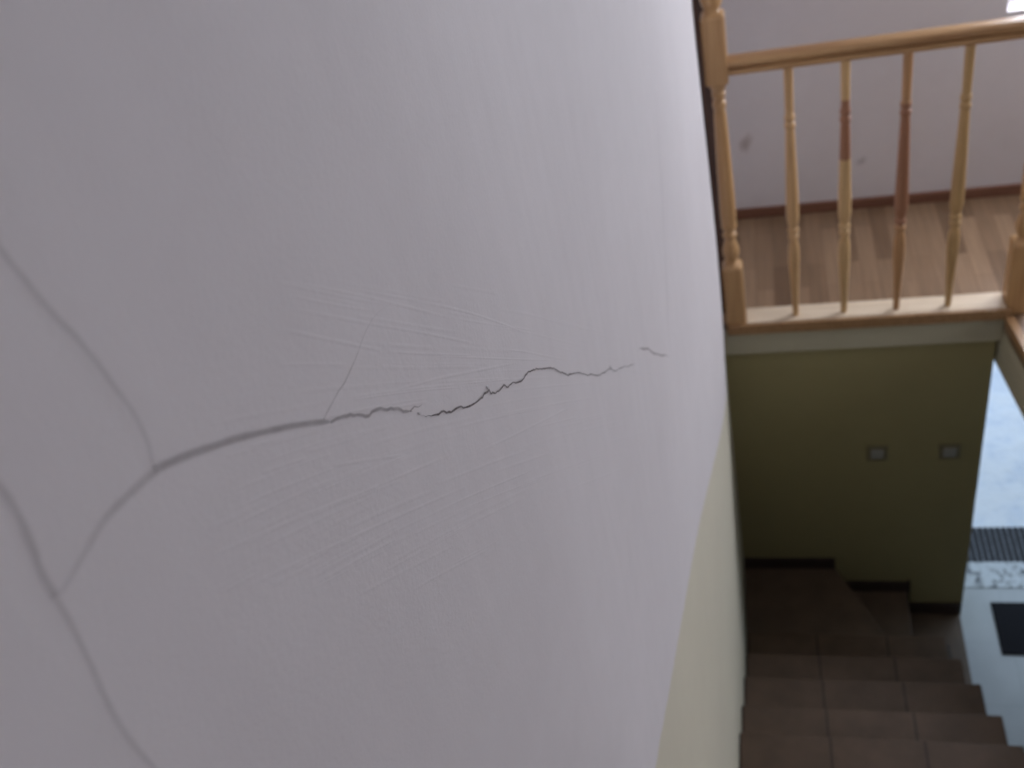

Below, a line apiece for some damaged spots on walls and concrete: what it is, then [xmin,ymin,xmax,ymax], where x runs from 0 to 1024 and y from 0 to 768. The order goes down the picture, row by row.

crack [417,366,614,417]